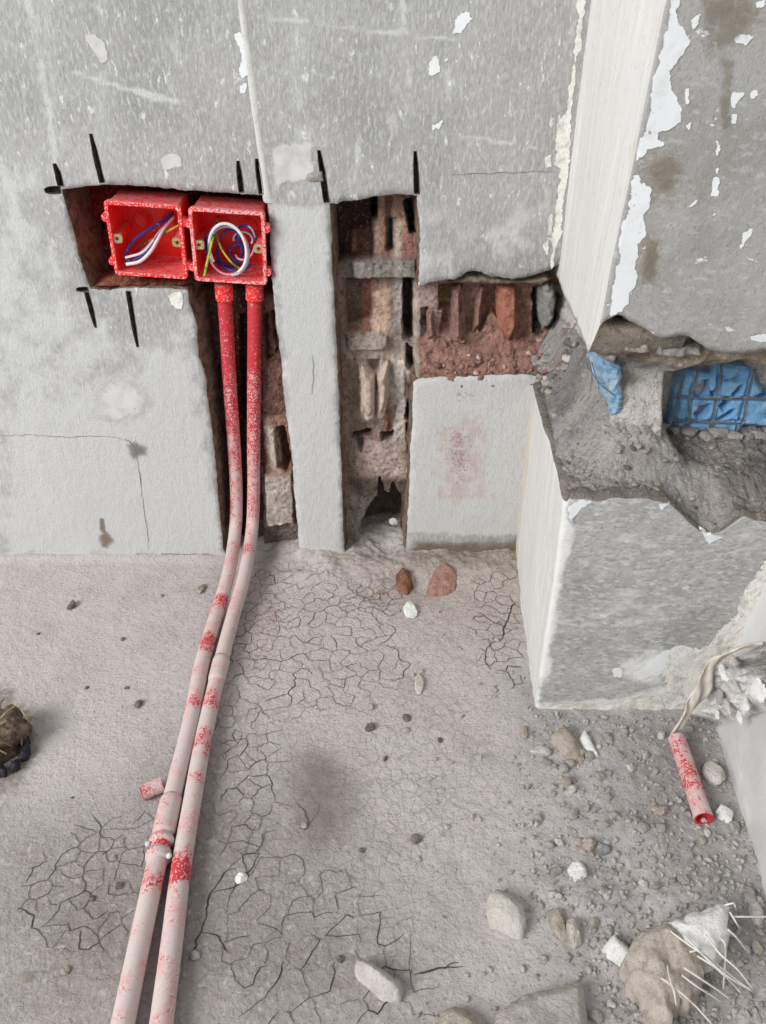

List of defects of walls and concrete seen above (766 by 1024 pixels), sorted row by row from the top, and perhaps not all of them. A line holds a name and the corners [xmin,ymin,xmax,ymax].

peeling [234,32,248,94]
flaking render [89,184,263,270]
spalling [336,0,766,544]
flaking render [203,241,298,544]
crack [19,434,208,555]
crack [481,604,513,670]
spalling [537,561,766,725]
crack [297,803,320,830]
crack [187,855,259,961]
crack [415,962,463,975]